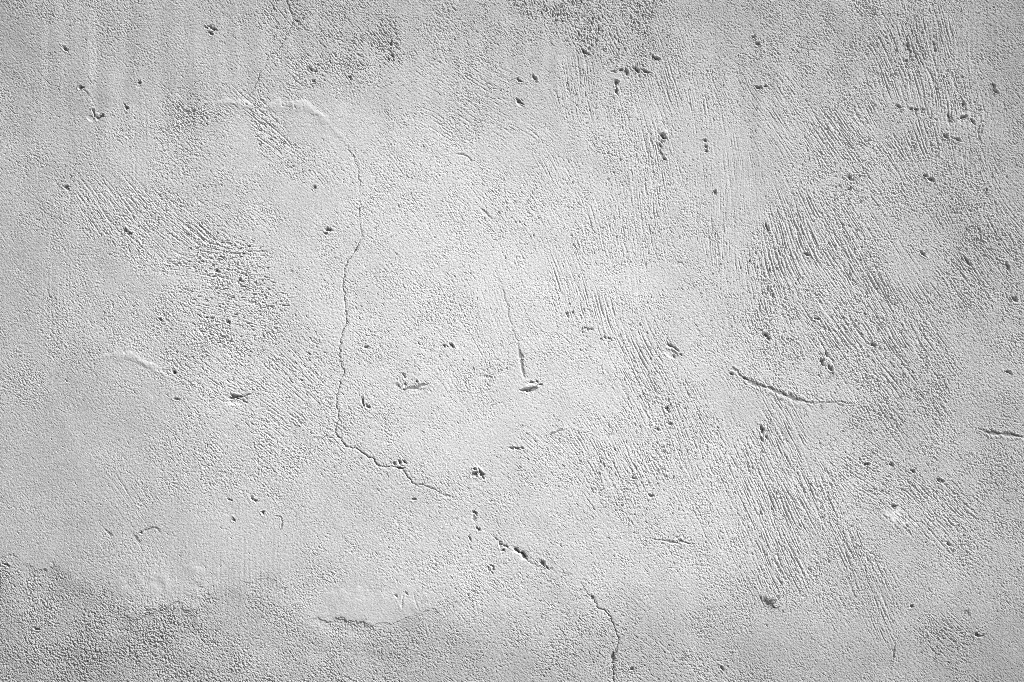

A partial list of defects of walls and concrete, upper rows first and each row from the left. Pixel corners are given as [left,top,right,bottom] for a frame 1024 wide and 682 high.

crack [320,152,444,495]
crack [493,536,619,681]